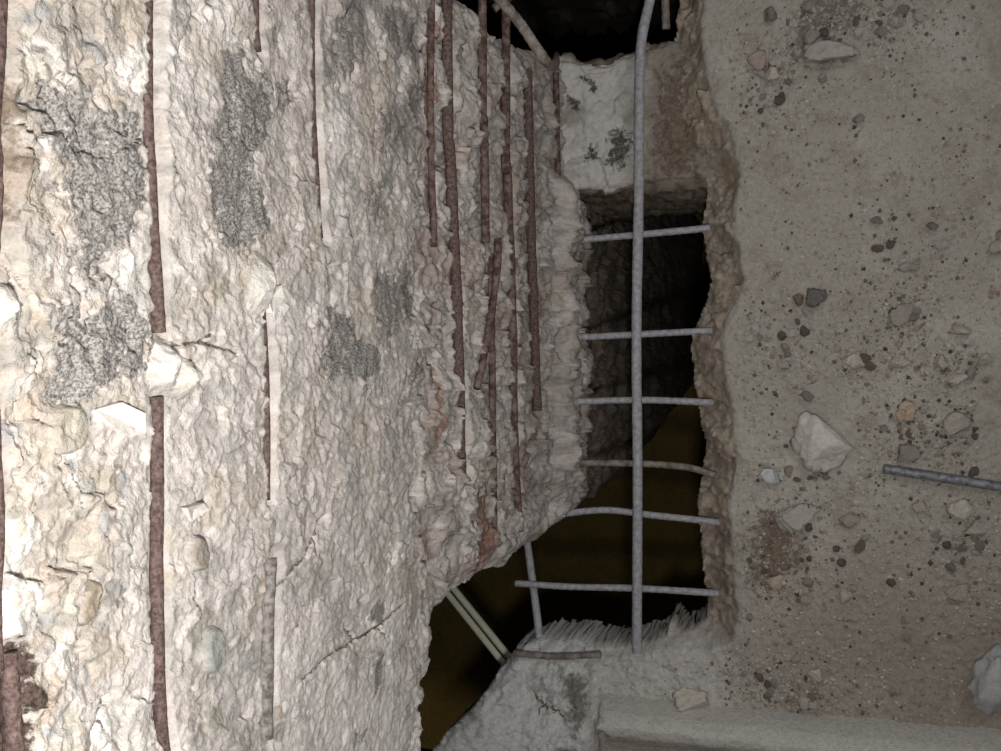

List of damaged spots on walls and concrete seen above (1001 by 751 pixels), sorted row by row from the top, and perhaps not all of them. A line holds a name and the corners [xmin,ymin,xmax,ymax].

spalling [327,0,371,85]
rust [1,90,34,172]
spalling [308,0,321,210]
spalling [372,0,561,531]
spalling [314,256,414,383]
spalling [514,0,720,656]
rust [431,368,449,447]
rust [466,486,501,573]
rust [4,635,48,751]
crack [302,605,402,679]
spalling [513,650,601,660]
spalling [561,673,588,740]